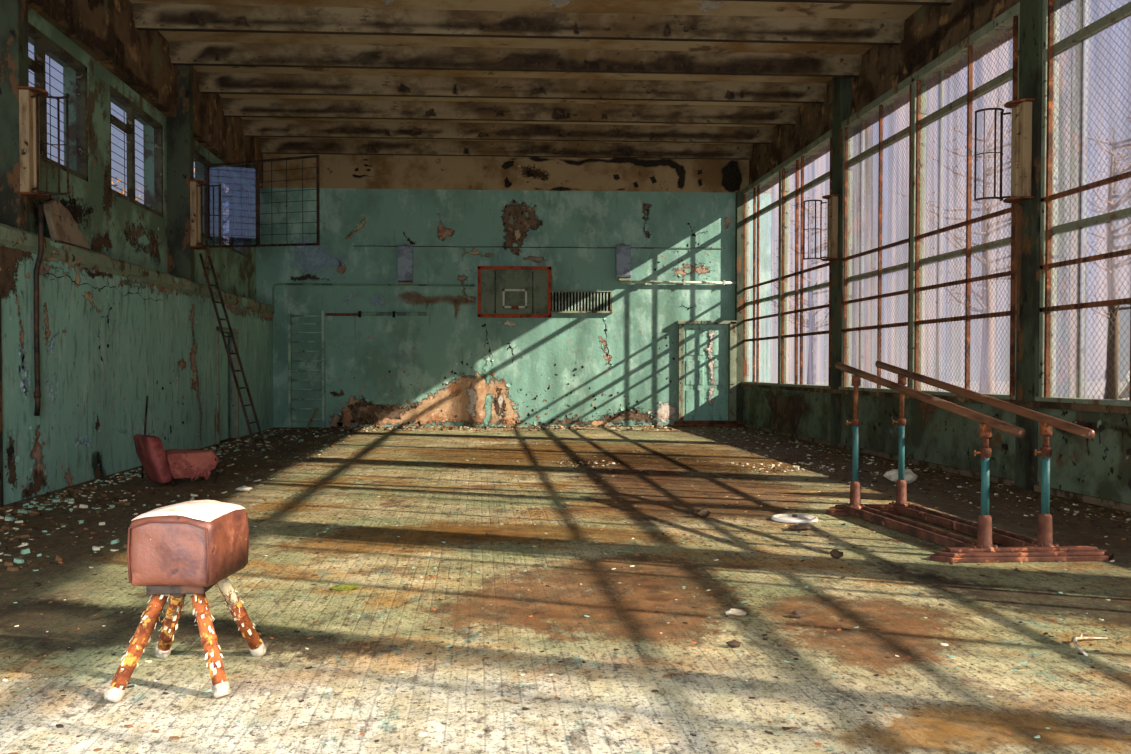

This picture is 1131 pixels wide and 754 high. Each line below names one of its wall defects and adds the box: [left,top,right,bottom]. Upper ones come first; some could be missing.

leakage [197,47,231,60]
leakage [157,11,303,26]
leakage [217,76,342,89]
leakage [366,16,592,34]
leakage [264,51,824,74]
leakage [752,29,876,37]
leakage [260,127,440,178]
leakage [468,108,778,192]
peeling [436,199,546,302]
flaking render [0,245,273,445]
flaking render [325,334,677,427]
flaking render [5,425,73,500]